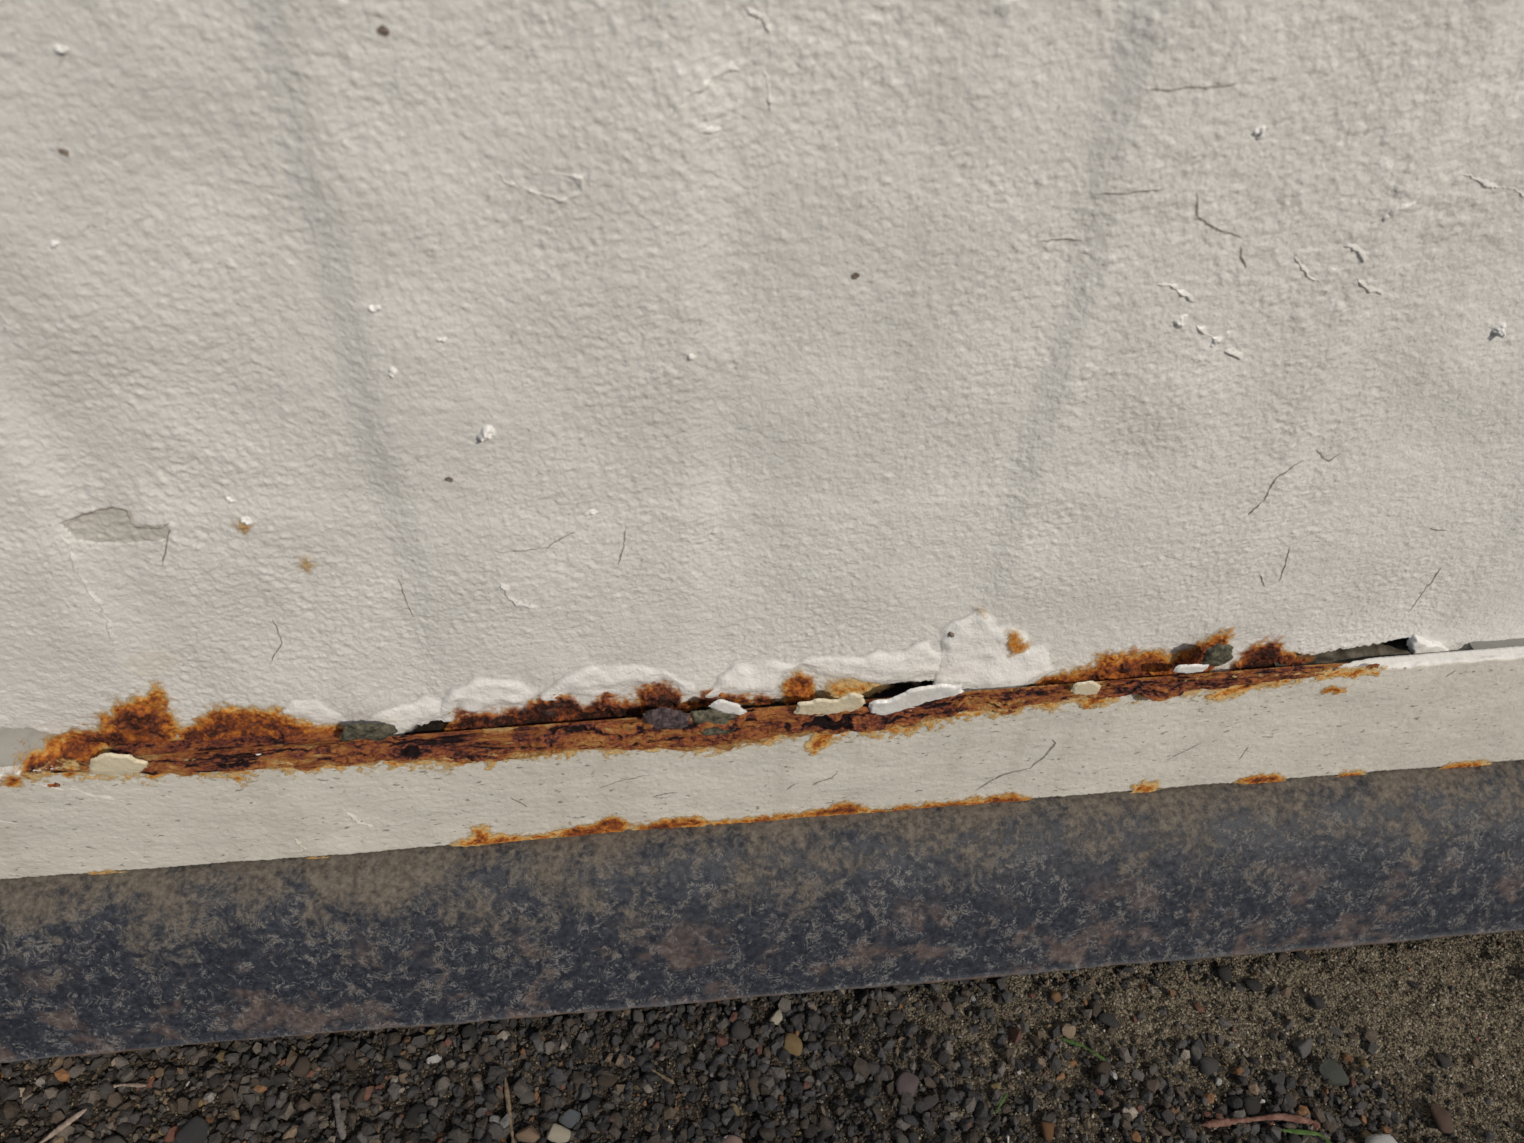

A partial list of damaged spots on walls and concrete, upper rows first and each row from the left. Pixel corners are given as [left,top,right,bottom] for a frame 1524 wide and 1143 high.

peeling [59,508,172,544]
corrosion [0,628,1388,788]
peeling [709,699,747,715]
peeling [794,683,964,716]
corrosion [450,792,1032,847]